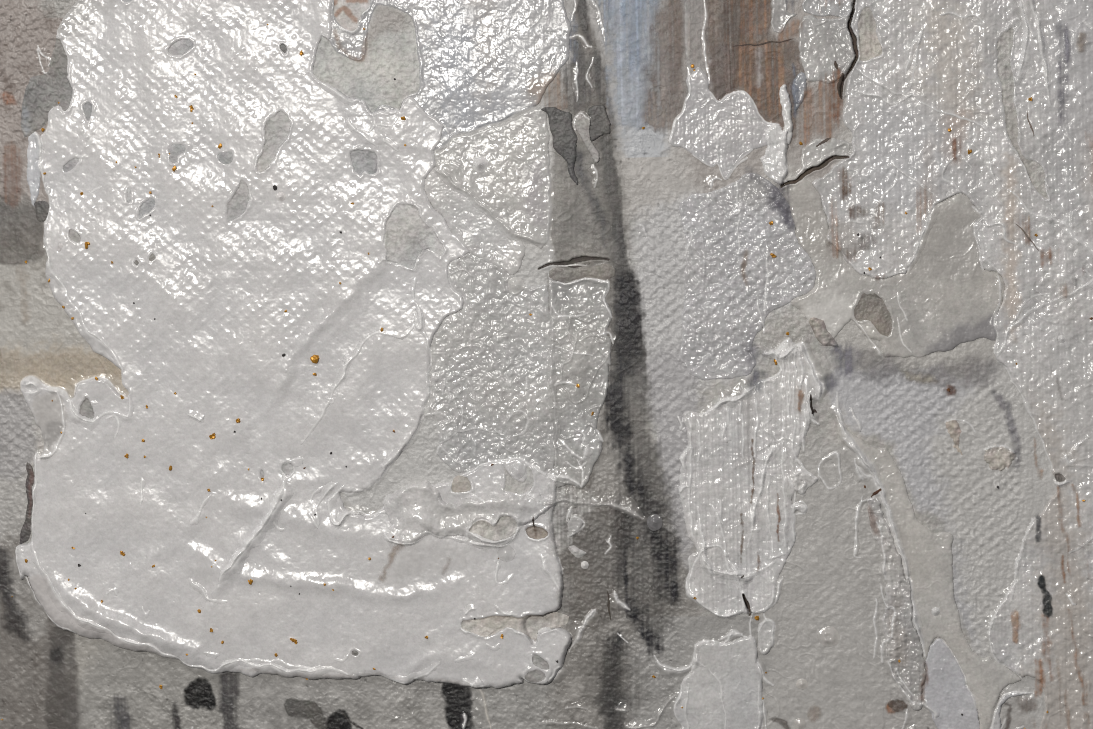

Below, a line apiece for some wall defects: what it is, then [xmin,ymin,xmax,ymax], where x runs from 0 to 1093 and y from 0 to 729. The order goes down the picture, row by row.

peeling [21,37,92,137]
peeling [298,0,420,175]
corrosion [706,0,841,144]
crack [834,0,858,99]
spalling [257,111,291,172]
crack [780,138,849,188]
spalling [34,201,49,222]
spalling [375,204,444,271]
crack [538,256,609,270]
spalling [854,293,892,336]
peeling [20,462,34,544]
peeling [461,604,569,641]